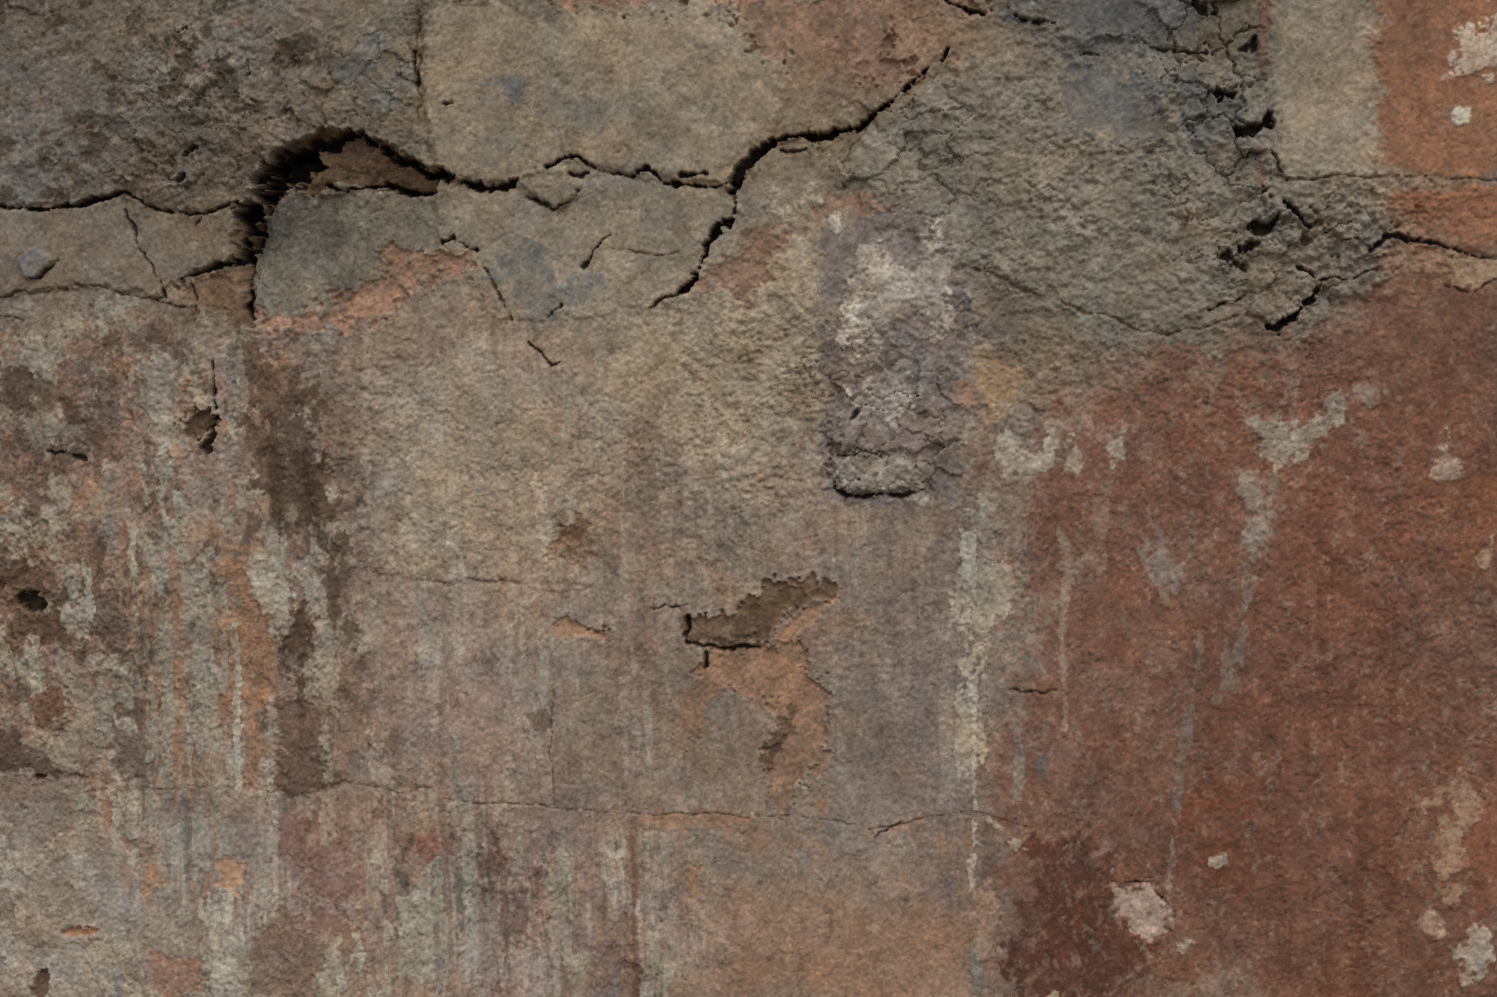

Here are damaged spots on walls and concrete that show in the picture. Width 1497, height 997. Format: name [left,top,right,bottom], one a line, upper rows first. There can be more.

crack [944,0,1056,26]
crack [1079,33,1209,57]
crack [0,4,949,330]
crack [440,234,563,368]
crack [968,148,1497,337]
damp [1136,521,1191,607]
damp [1166,465,1280,815]
flaking render [613,572,847,915]
damp [882,475,1178,997]